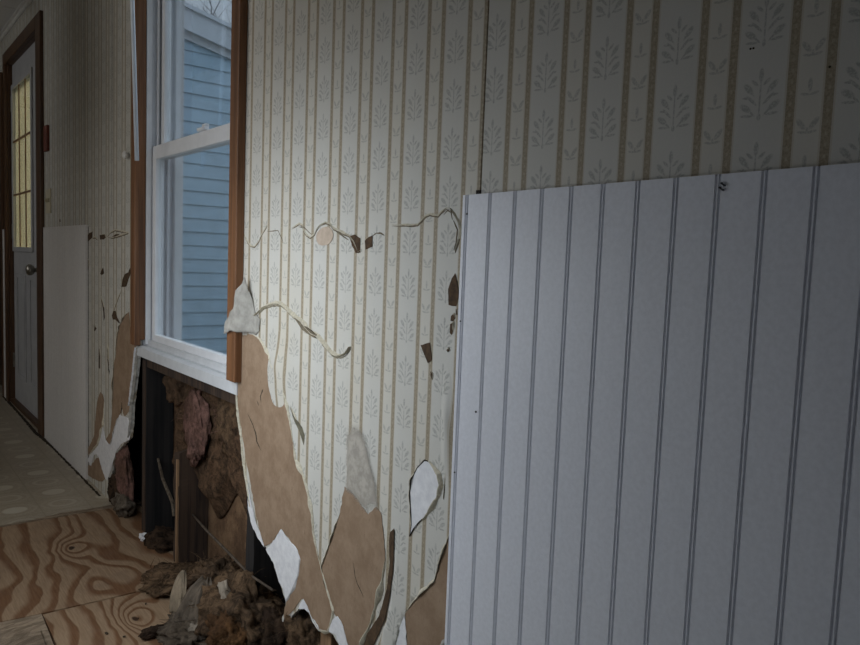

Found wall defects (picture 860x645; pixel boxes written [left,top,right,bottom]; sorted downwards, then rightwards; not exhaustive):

peeling [224,277,260,335]
flaking render [88,347,138,480]
flaking render [234,389,301,601]
flaking render [408,460,443,536]
flaking render [298,599,348,645]
flaking render [395,617,407,645]